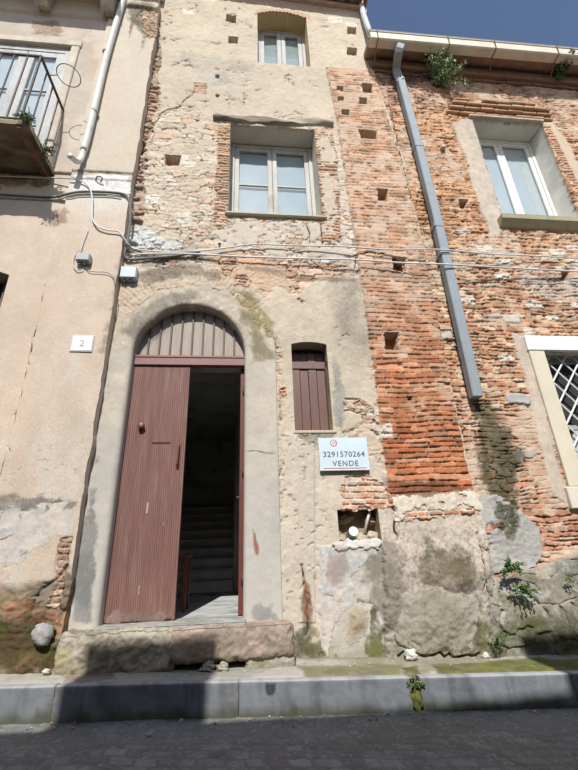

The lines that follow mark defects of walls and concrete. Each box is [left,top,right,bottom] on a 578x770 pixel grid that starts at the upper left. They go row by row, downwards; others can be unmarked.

leakage [473,401,524,502]
flaking render [0,501,75,609]